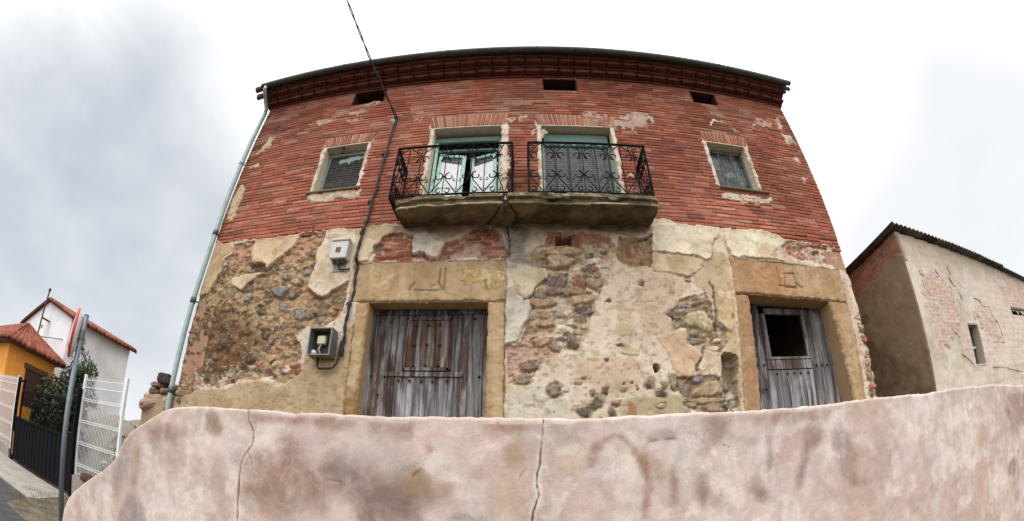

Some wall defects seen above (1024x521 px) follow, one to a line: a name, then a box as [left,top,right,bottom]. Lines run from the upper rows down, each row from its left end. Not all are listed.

spalling [177,223,846,419]
spalling [918,268,1004,350]
crack [236,409,255,521]
crack [518,418,544,521]